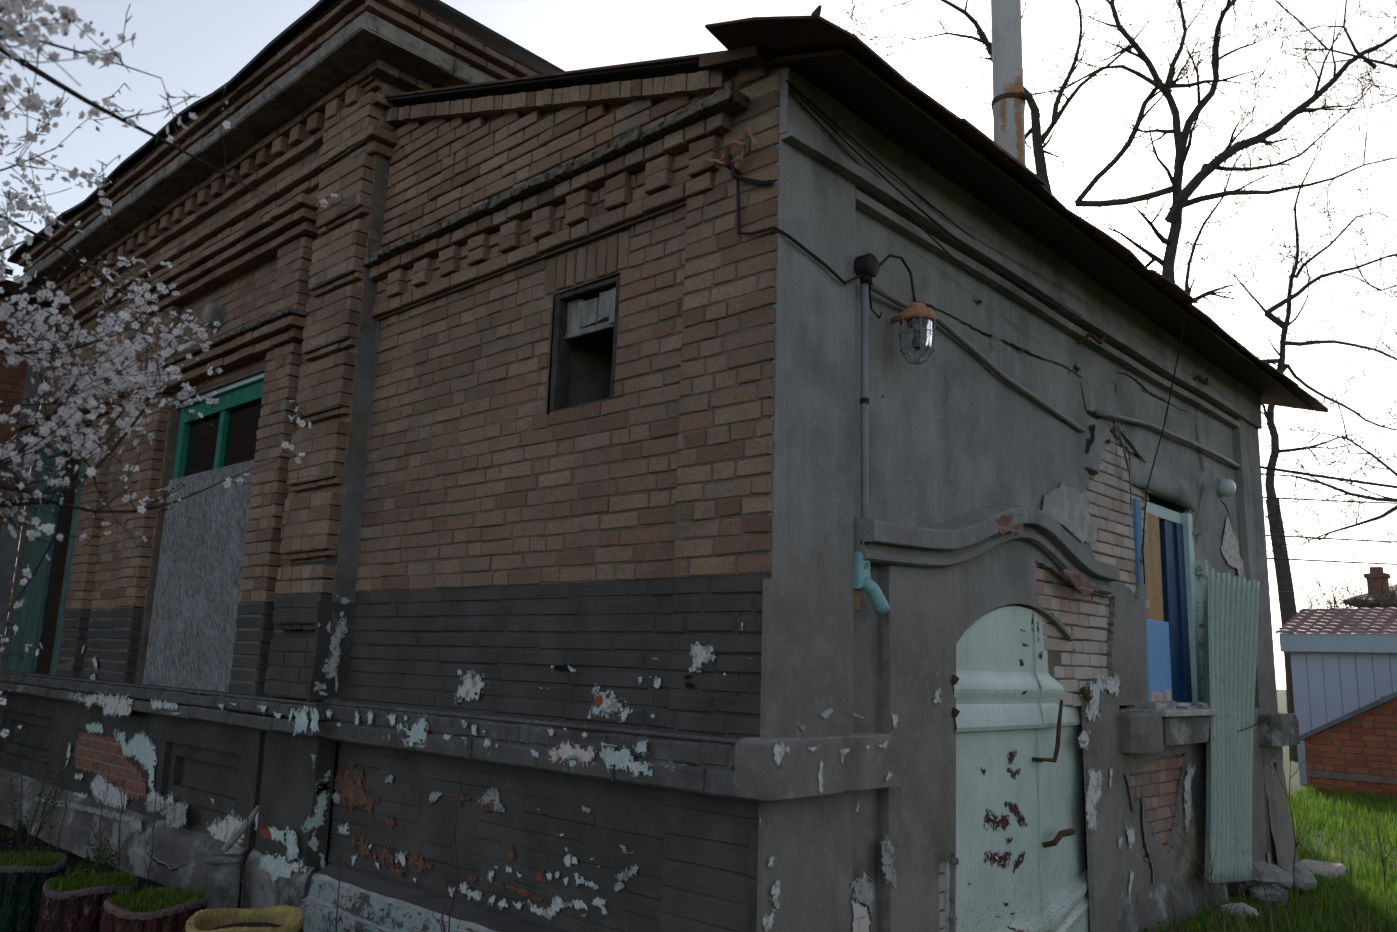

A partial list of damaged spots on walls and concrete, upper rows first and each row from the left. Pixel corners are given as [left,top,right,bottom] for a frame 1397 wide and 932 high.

rust [999,77,1025,165]
crack [916,299,1146,511]
crack [1118,368,1188,412]
flaking render [1020,410,1150,750]
peeling [258,595,498,748]
peeling [684,641,726,689]
spalling [25,645,188,836]
peeling [530,683,654,777]
spalling [207,753,434,884]
peeling [1086,768,1113,831]
peeling [448,834,639,921]
flaking render [851,835,898,932]